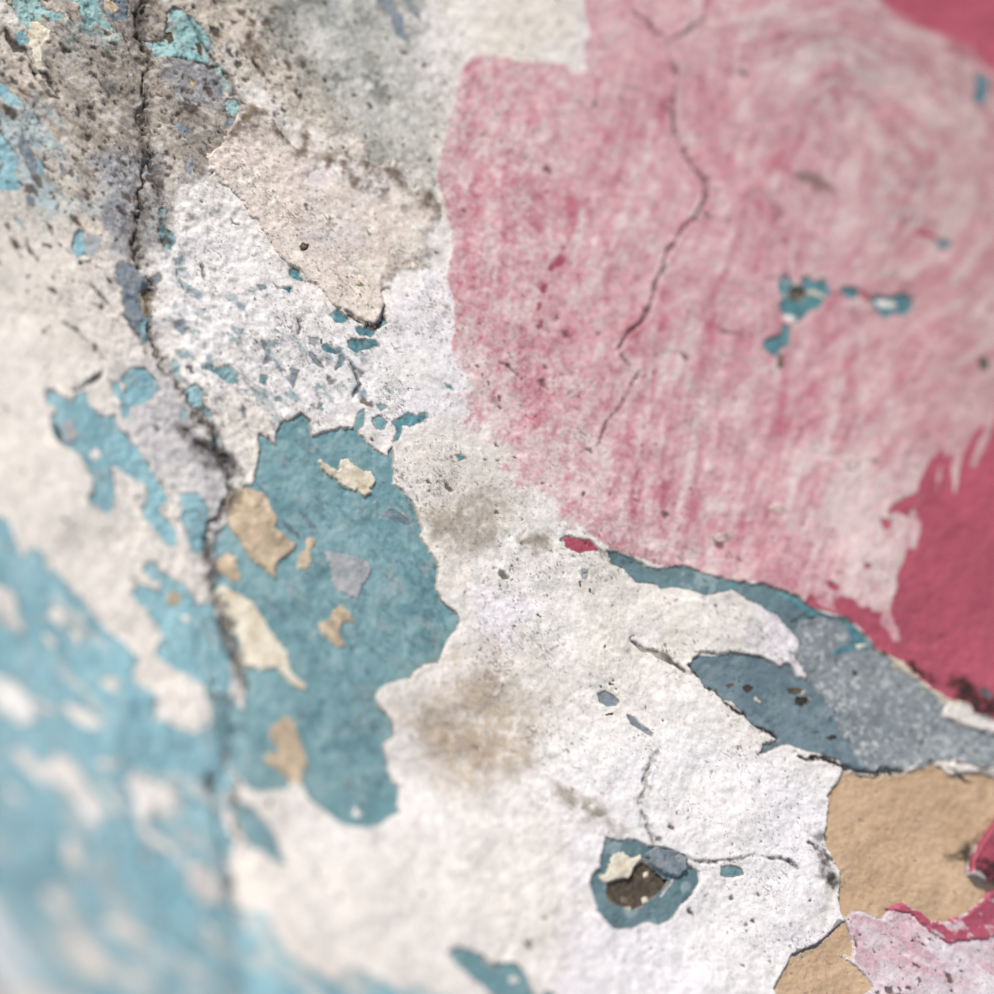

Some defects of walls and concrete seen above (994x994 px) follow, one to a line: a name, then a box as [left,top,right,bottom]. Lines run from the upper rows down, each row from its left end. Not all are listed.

peeling [7,0,129,68]
peeling [0,82,23,107]
peeling [0,134,44,208]
crack [129,0,247,697]
peeling [201,364,238,384]
peeling [763,276,912,368]
peeling [881,494,921,530]
peeling [0,368,459,994]
peeling [561,536,994,994]
crack [204,744,244,926]
peeling [448,949,532,994]